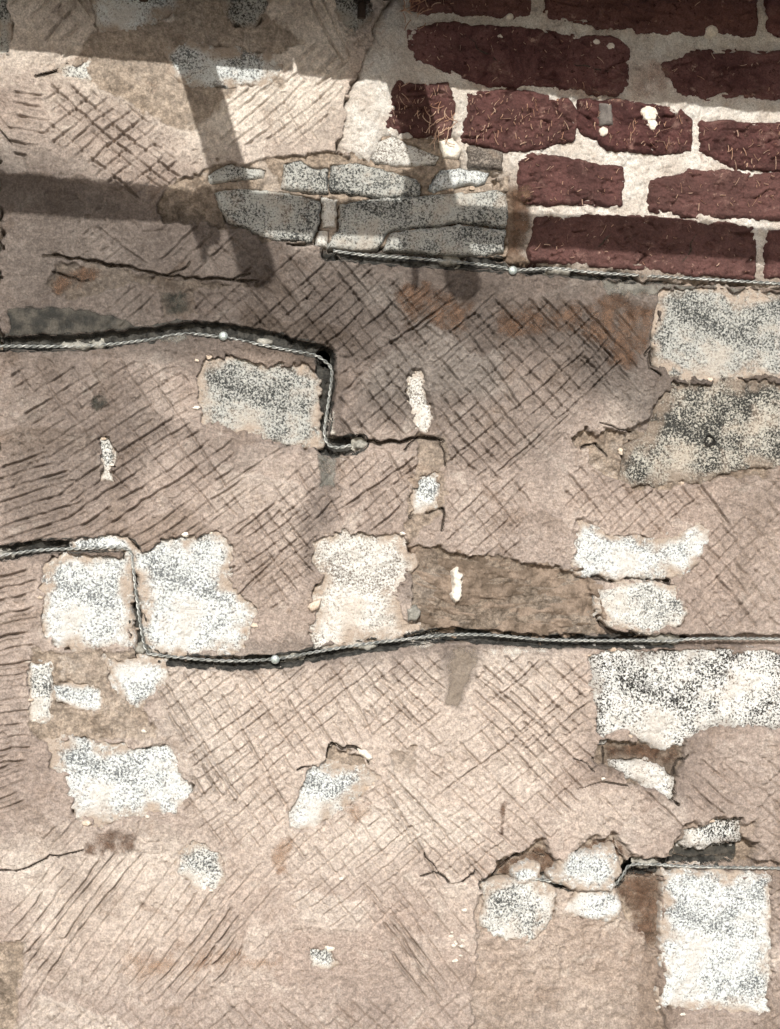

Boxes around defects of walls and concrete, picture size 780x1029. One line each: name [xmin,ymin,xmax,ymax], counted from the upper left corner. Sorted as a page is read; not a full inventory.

spalling [208,137,508,258]
spalling [193,355,326,451]
crack [345,435,446,466]
spalling [617,283,780,488]
spalling [25,531,258,724]
spalling [308,529,421,651]
crack [595,615,690,639]
spalling [568,520,780,799]
spalling [45,734,194,829]
crack [420,851,544,883]
spalling [478,841,622,945]
spalling [653,817,772,1016]